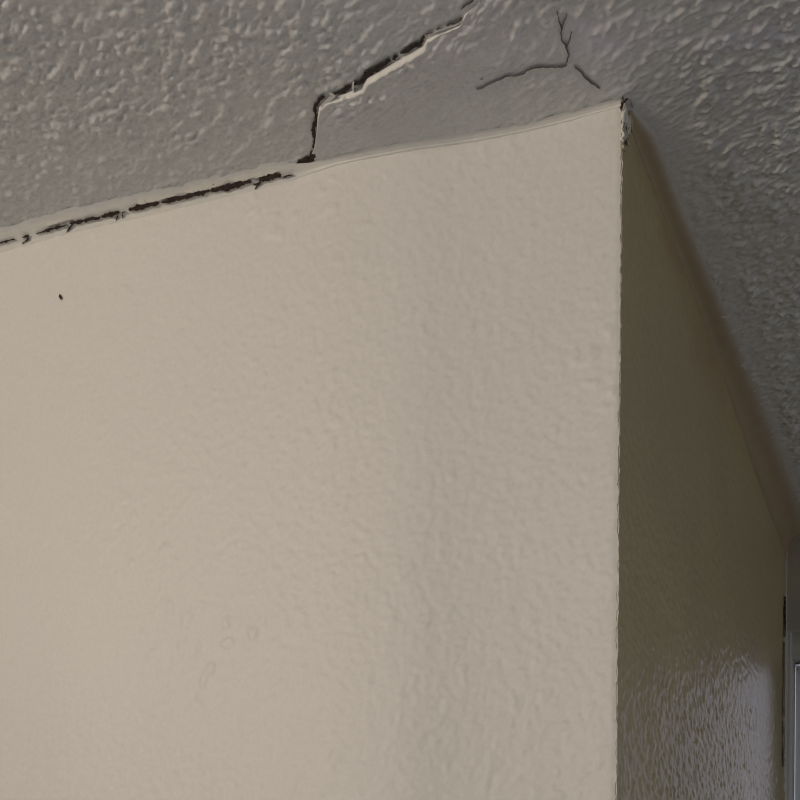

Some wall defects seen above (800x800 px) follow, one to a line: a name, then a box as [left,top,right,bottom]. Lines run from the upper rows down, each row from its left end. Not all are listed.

crack [0,0,481,244]
crack [477,12,600,90]